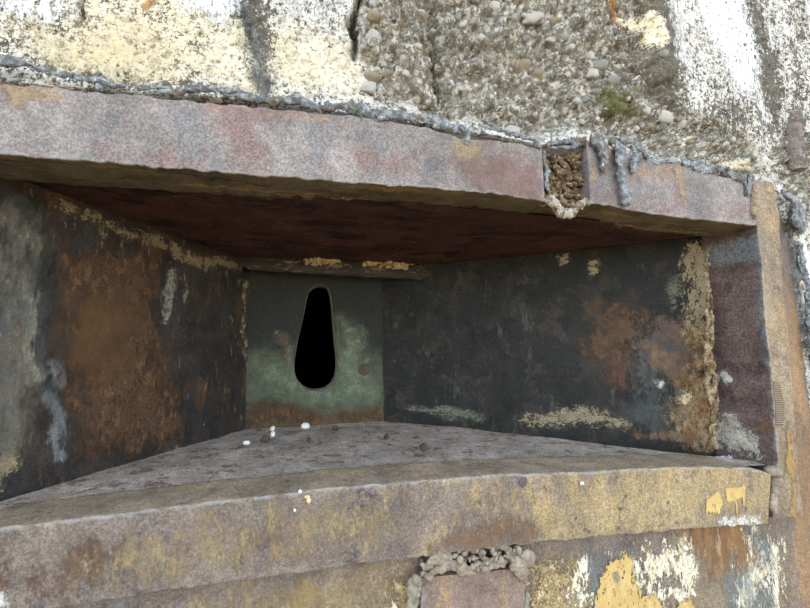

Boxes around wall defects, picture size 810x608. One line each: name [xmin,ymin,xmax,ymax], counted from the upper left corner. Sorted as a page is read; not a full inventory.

crack [349,0,361,62]
corrosion [4,84,42,108]
crack [430,55,440,106]
corrosion [452,139,591,220]
corrosion [46,243,185,460]
corrosion [579,299,714,454]
corrosion [26,499,404,600]
corrosion [383,574,409,608]
peeling [528,551,600,608]
peeling [608,530,700,608]
corrosion [674,525,757,581]